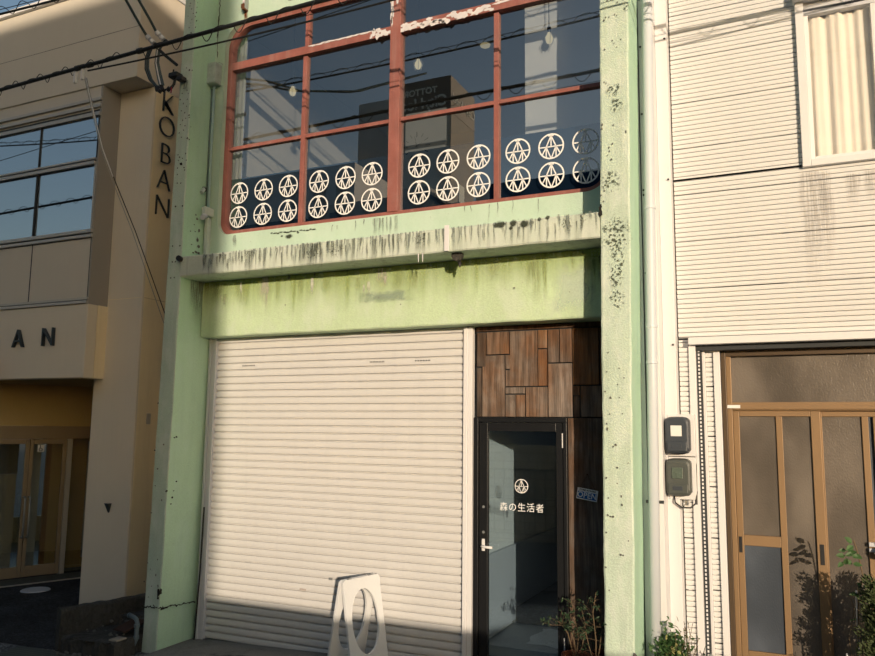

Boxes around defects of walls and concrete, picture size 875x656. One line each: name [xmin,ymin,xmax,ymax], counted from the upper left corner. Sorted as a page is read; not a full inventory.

water stain [205,199,629,308]
crack [141,601,195,609]